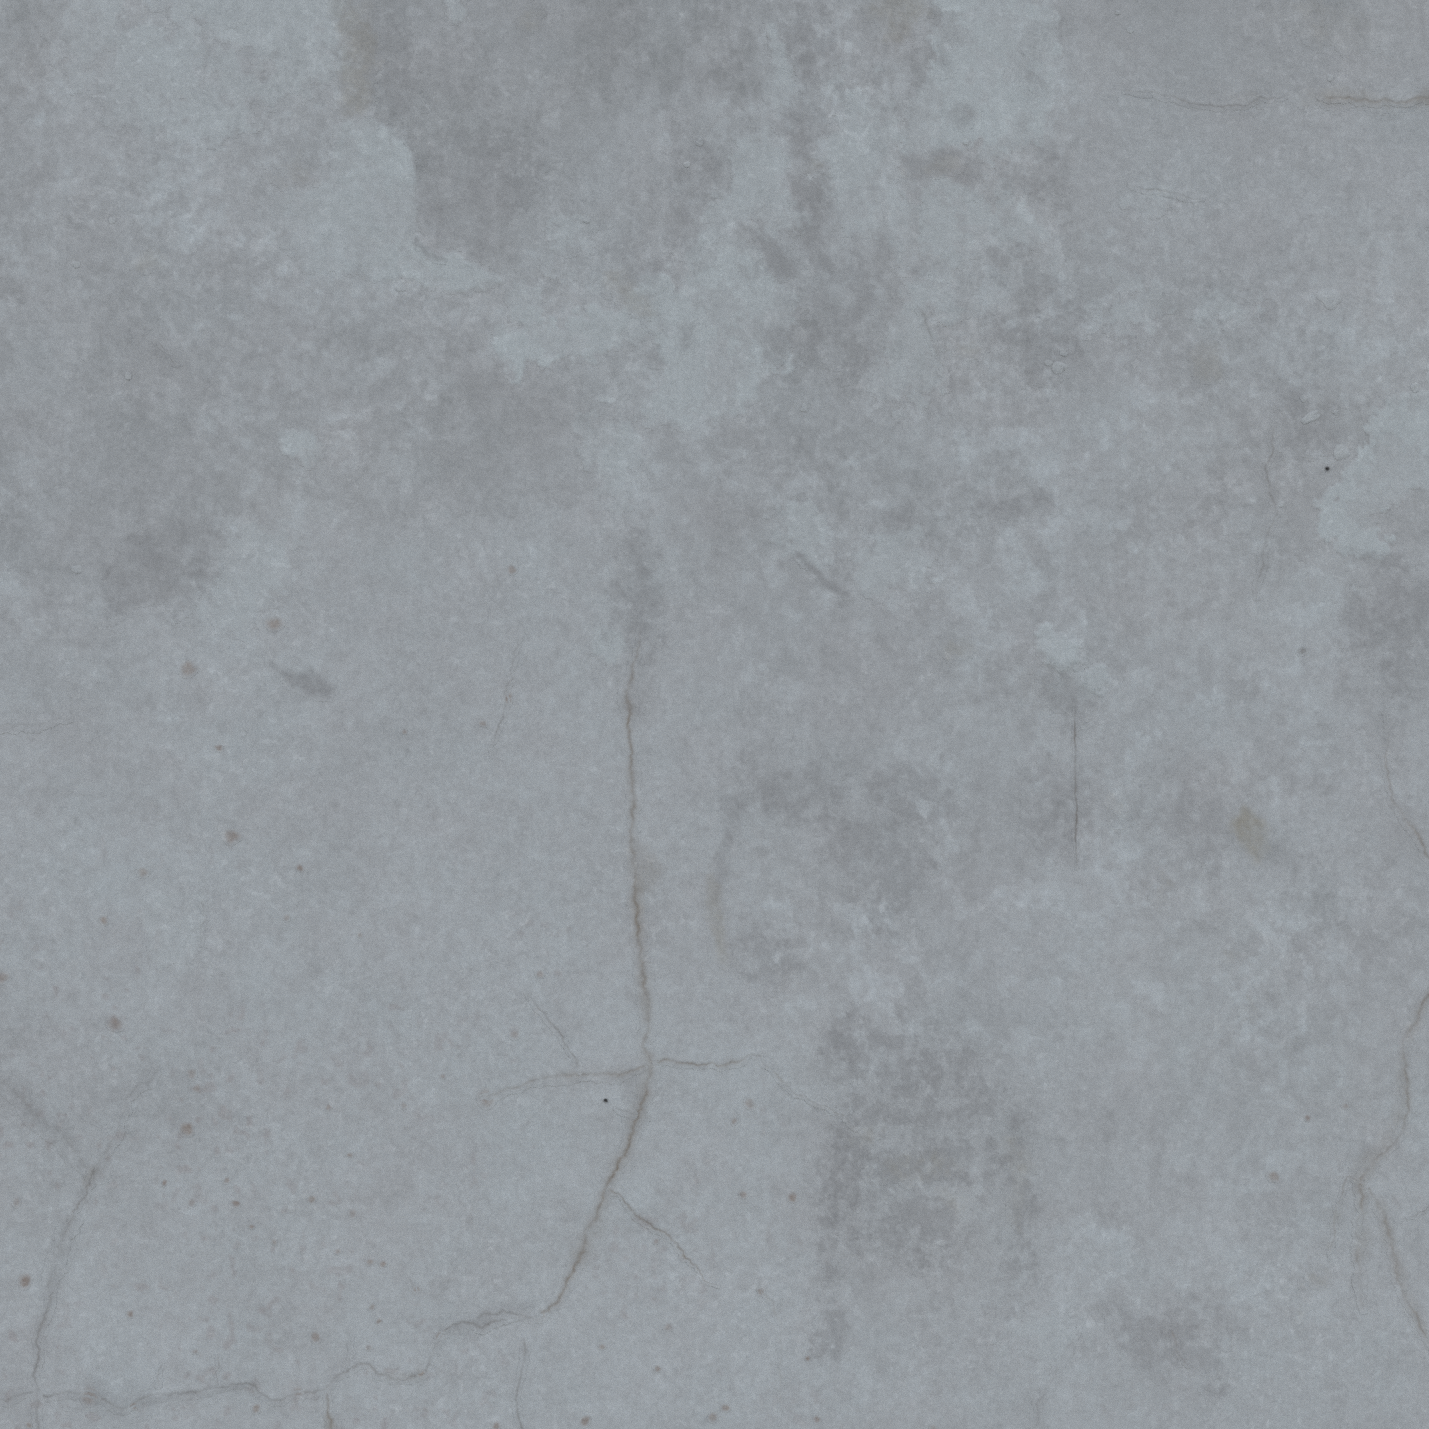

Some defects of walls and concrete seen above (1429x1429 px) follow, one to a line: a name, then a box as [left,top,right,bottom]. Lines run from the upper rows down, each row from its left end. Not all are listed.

crack [1380,713,1429,871]
crack [0,624,859,1429]
crack [1327,980,1429,1354]